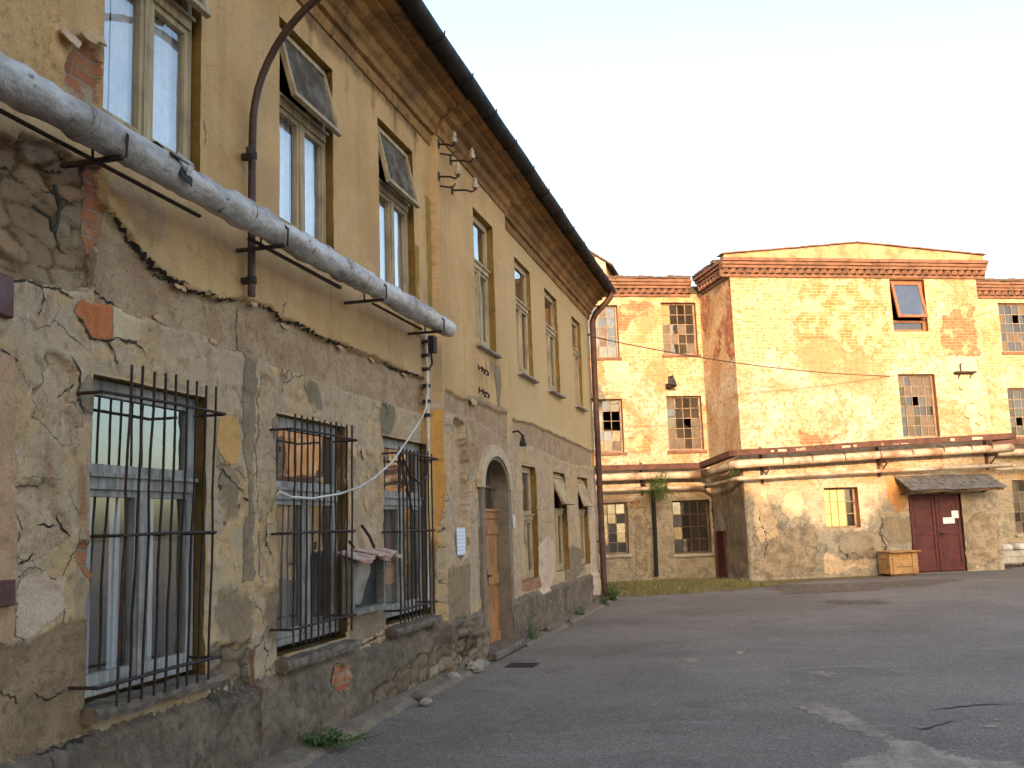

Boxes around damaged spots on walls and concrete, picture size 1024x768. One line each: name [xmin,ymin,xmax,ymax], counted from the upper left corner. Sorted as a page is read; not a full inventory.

flaking render [0,0,108,109]
crack [0,163,353,358]
crack [14,279,148,418]
spalling [0,132,477,560]
flaking render [940,303,989,434]
peeling [0,351,92,643]
crack [36,516,71,537]
flaking render [752,491,872,580]
flaking render [332,661,353,693]
crack [879,704,991,729]